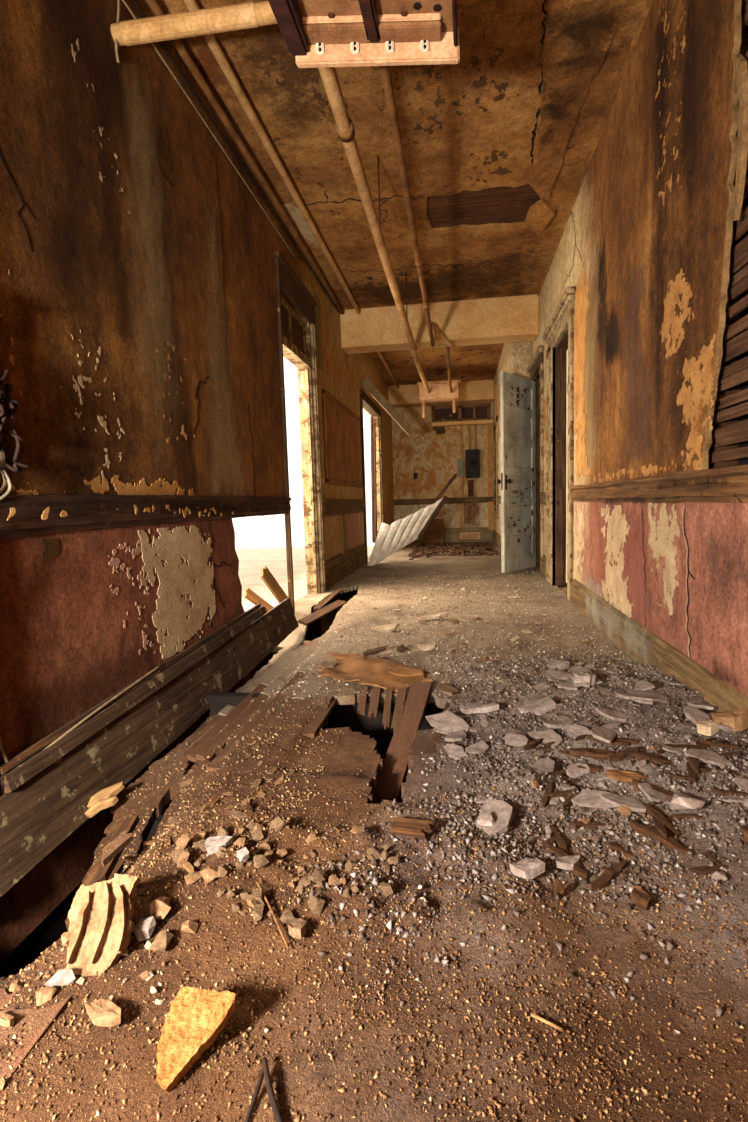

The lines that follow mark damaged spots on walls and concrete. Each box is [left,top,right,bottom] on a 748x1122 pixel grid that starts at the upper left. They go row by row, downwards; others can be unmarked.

crack [530,0,547,165]
flaking render [544,0,748,482]
spalling [5,483,73,521]
peeling [61,330,234,659]
peeling [601,505,634,618]
peeling [648,502,680,615]
crack [682,505,695,659]